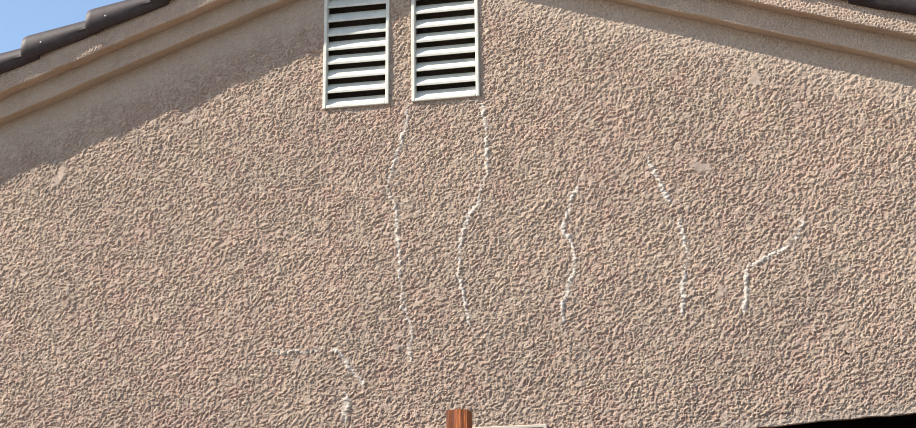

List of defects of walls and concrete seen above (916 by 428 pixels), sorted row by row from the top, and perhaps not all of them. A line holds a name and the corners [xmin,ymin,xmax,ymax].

crack [386,101,414,363]
crack [455,103,489,331]
crack [560,173,583,330]
crack [647,145,689,322]
crack [741,218,804,313]
crack [271,348,365,386]